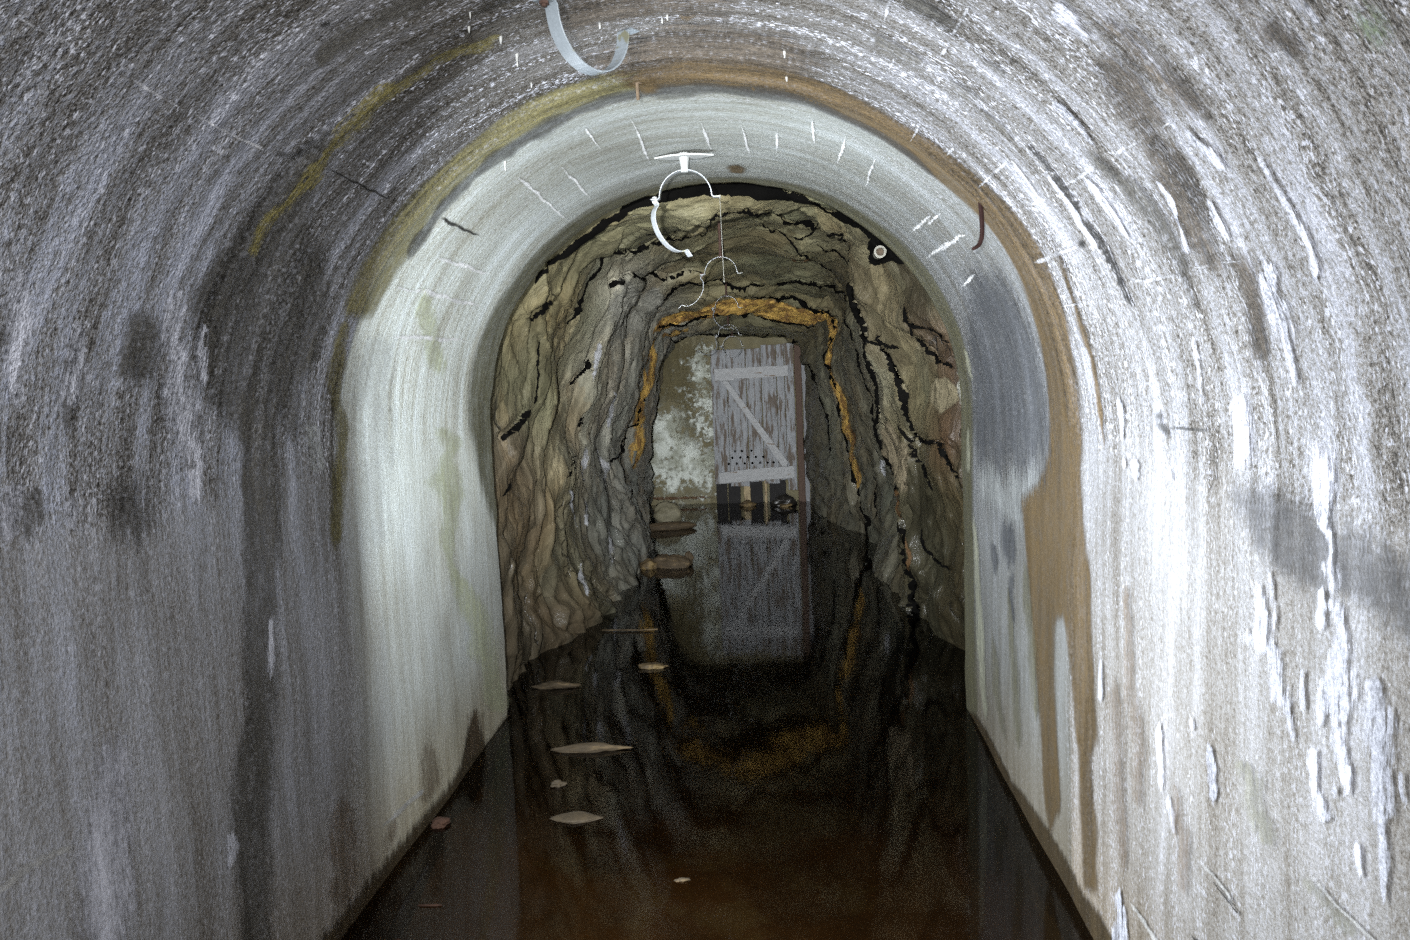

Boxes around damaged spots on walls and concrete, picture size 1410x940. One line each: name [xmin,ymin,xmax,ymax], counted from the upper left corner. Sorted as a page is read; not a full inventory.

leakage [113,0,827,940]
corrosion [618,55,1104,890]
leakage [1233,397,1253,468]
leakage [1234,442,1410,903]